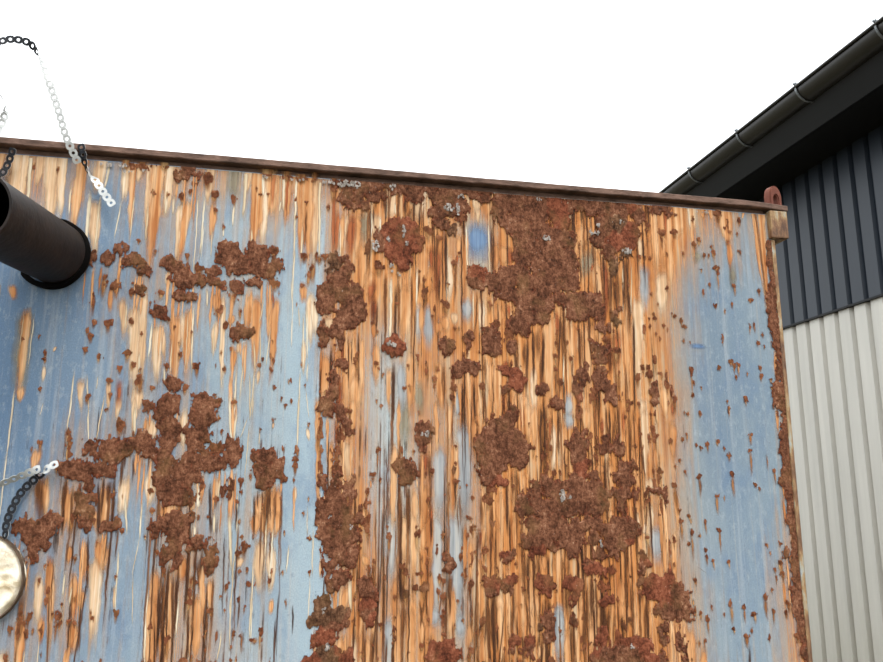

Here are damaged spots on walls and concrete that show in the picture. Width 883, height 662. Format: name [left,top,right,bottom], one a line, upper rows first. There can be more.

rust [0,153,808,662]